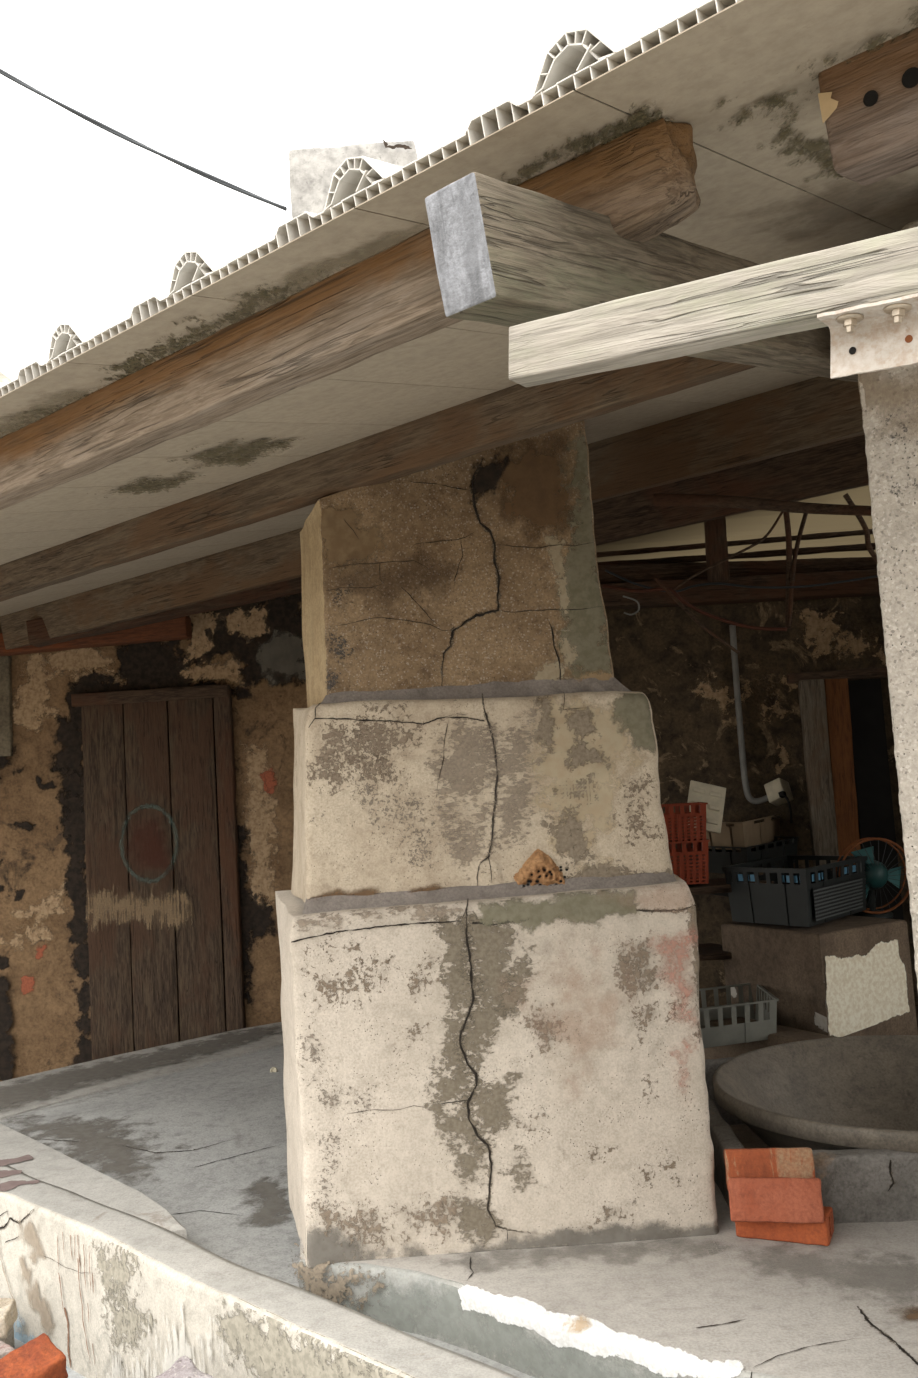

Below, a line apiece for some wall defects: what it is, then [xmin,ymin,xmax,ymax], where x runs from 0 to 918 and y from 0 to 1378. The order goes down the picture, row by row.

water stain [717,8,918,181]
water stain [104,438,296,498]
flaking render [180,606,270,684]
flaking render [12,648,123,733]
crack [291,458,602,1240]
flaking render [0,882,69,959]
crack [636,905,696,914]
water stain [293,885,719,1272]
flaking render [216,1298,414,1378]
water stain [330,1282,672,1378]
peeling [458,1284,744,1378]
crack [751,1306,918,1378]